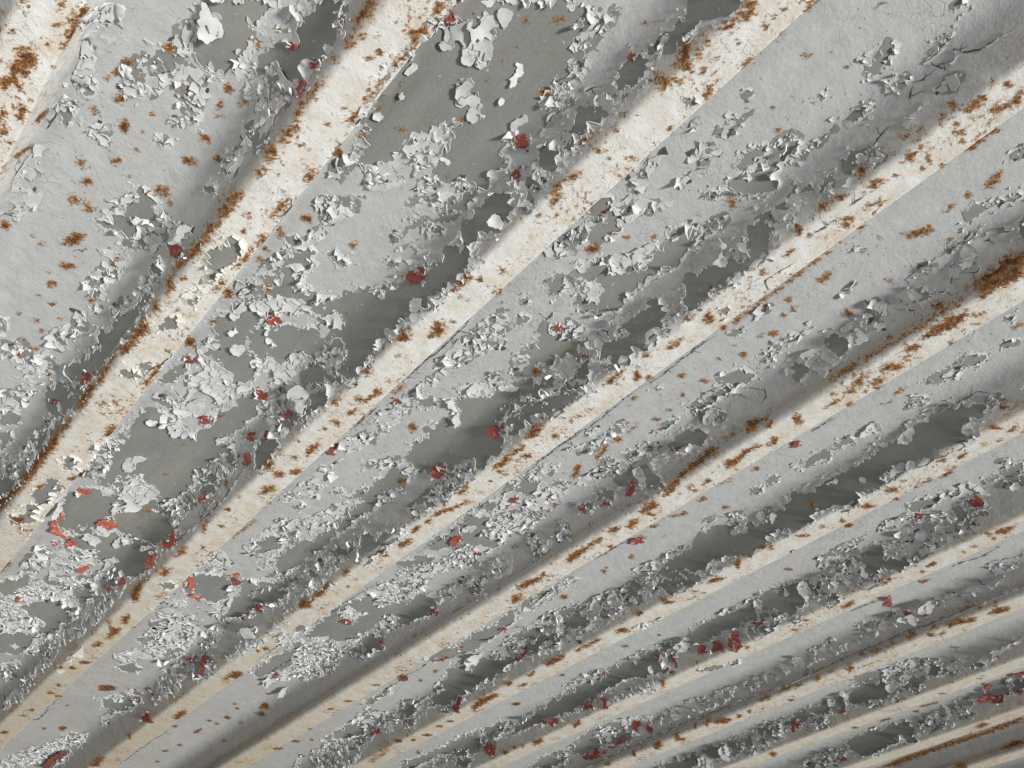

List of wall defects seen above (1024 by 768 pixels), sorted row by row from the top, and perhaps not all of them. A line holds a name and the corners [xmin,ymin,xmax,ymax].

corrosion [0,0,91,159]
peeling [52,3,126,148]
corrosion [112,93,145,136]
peeling [117,0,351,198]
crack [908,30,1014,99]
corrosion [144,184,175,207]
corrosion [0,188,295,525]
peeling [92,87,1024,728]
corrosion [822,250,1024,409]
corrosion [877,717,1024,768]